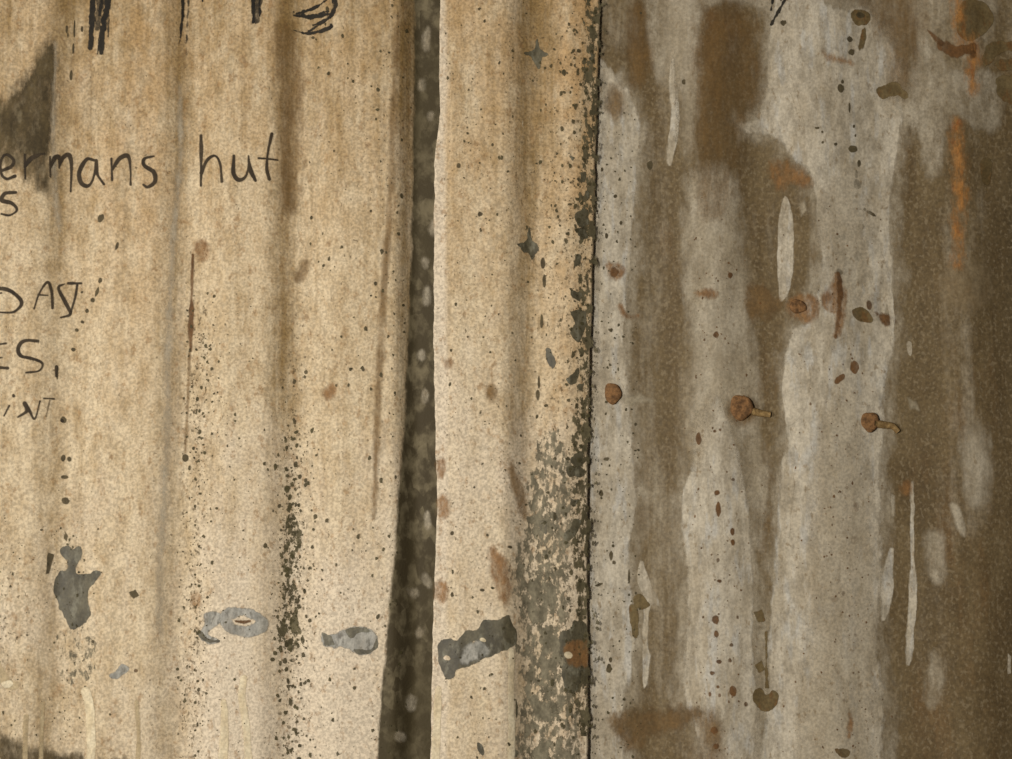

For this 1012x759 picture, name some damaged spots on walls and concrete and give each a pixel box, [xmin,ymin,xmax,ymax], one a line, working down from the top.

peeling [437,0,659,759]
corrosion [746,272,896,338]
peeling [640,0,1012,759]
leakage [176,292,247,735]
peeling [46,533,101,685]
peeling [198,607,268,644]
peeling [321,627,378,655]